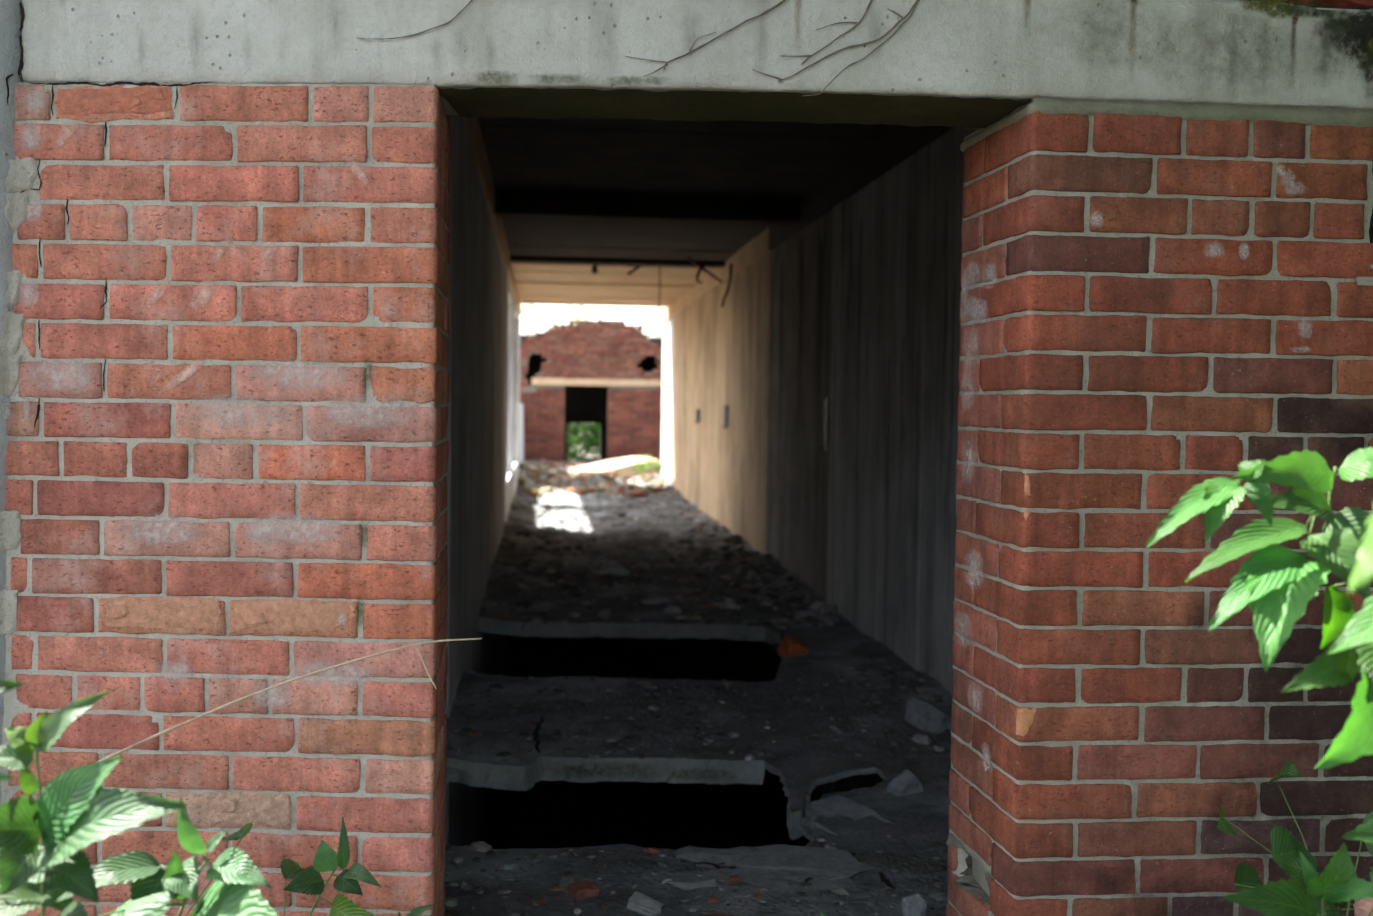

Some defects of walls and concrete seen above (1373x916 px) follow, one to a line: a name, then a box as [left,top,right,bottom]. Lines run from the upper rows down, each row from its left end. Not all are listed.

spalling [946,833,993,905]